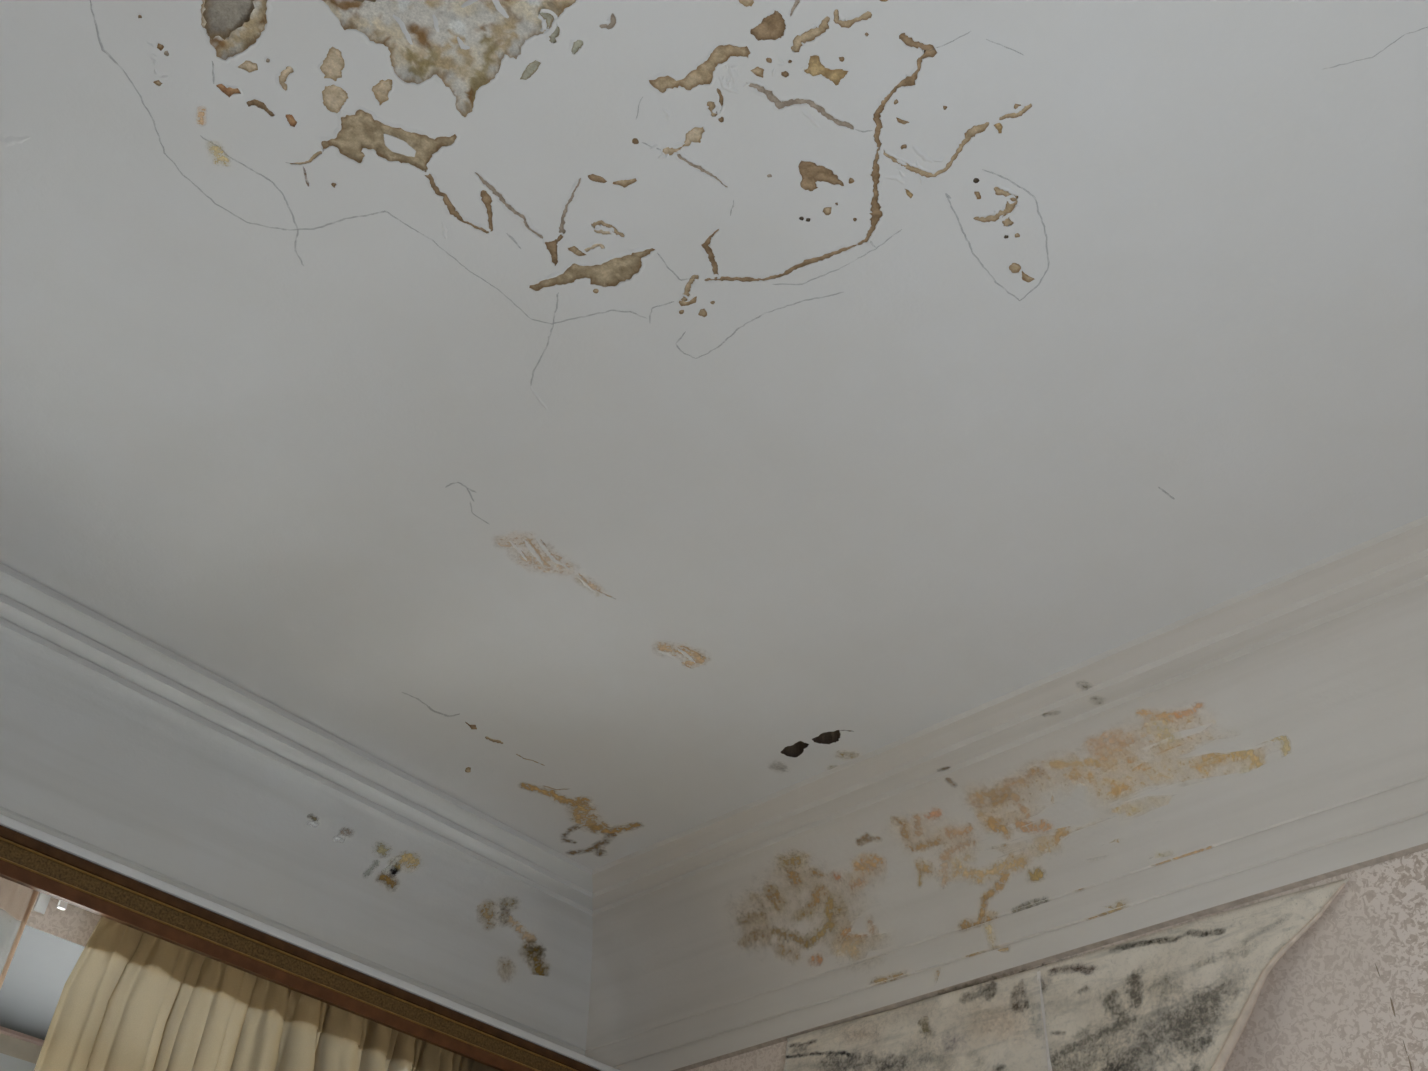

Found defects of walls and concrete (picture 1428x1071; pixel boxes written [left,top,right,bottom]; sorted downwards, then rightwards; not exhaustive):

flaking render [196,0,299,128]
flaking render [289,0,585,175]
flaking render [647,0,891,124]
crack [303,168,338,189]
crack [421,171,583,268]
flaking render [528,217,658,294]
crack [631,125,729,189]
crack [677,31,1034,318]
damp [896,769,1065,933]
damp [946,964,1094,1010]
damp [1052,974,1217,1071]
damp [1116,930,1222,950]